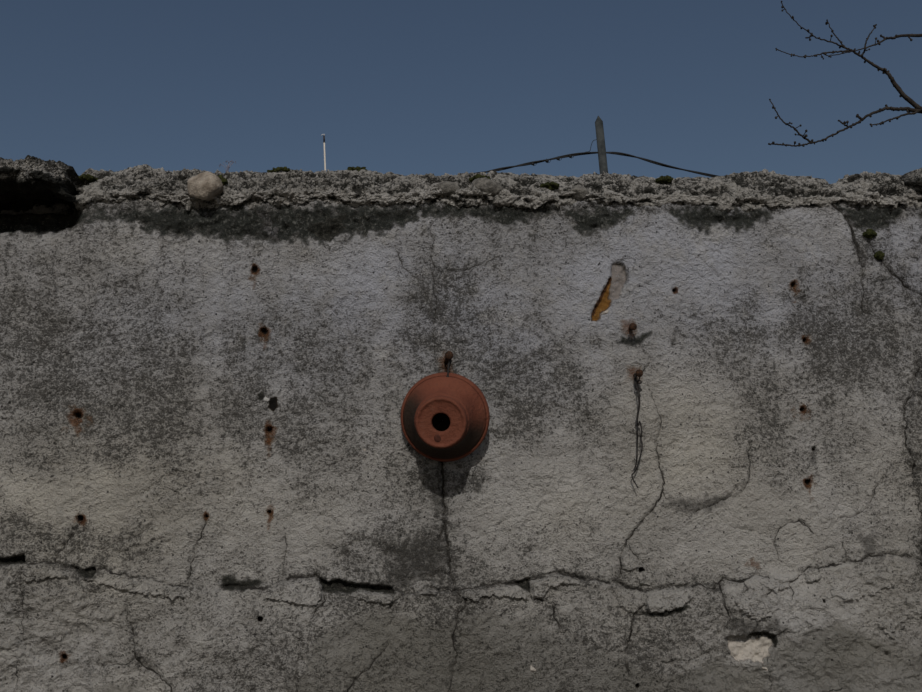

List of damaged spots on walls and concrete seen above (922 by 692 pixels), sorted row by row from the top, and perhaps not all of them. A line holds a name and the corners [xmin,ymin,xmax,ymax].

water stain [0,201,634,245]
crack [398,225,500,319]
spalling [591,263,627,321]
water stain [669,204,773,235]
water stain [835,202,902,231]
crack [831,203,922,314]
crack [429,357,922,691]
crack [2,521,206,633]
crack [221,533,415,618]
crack [112,618,172,692]
crack [329,644,389,692]
spalling [727,632,778,671]